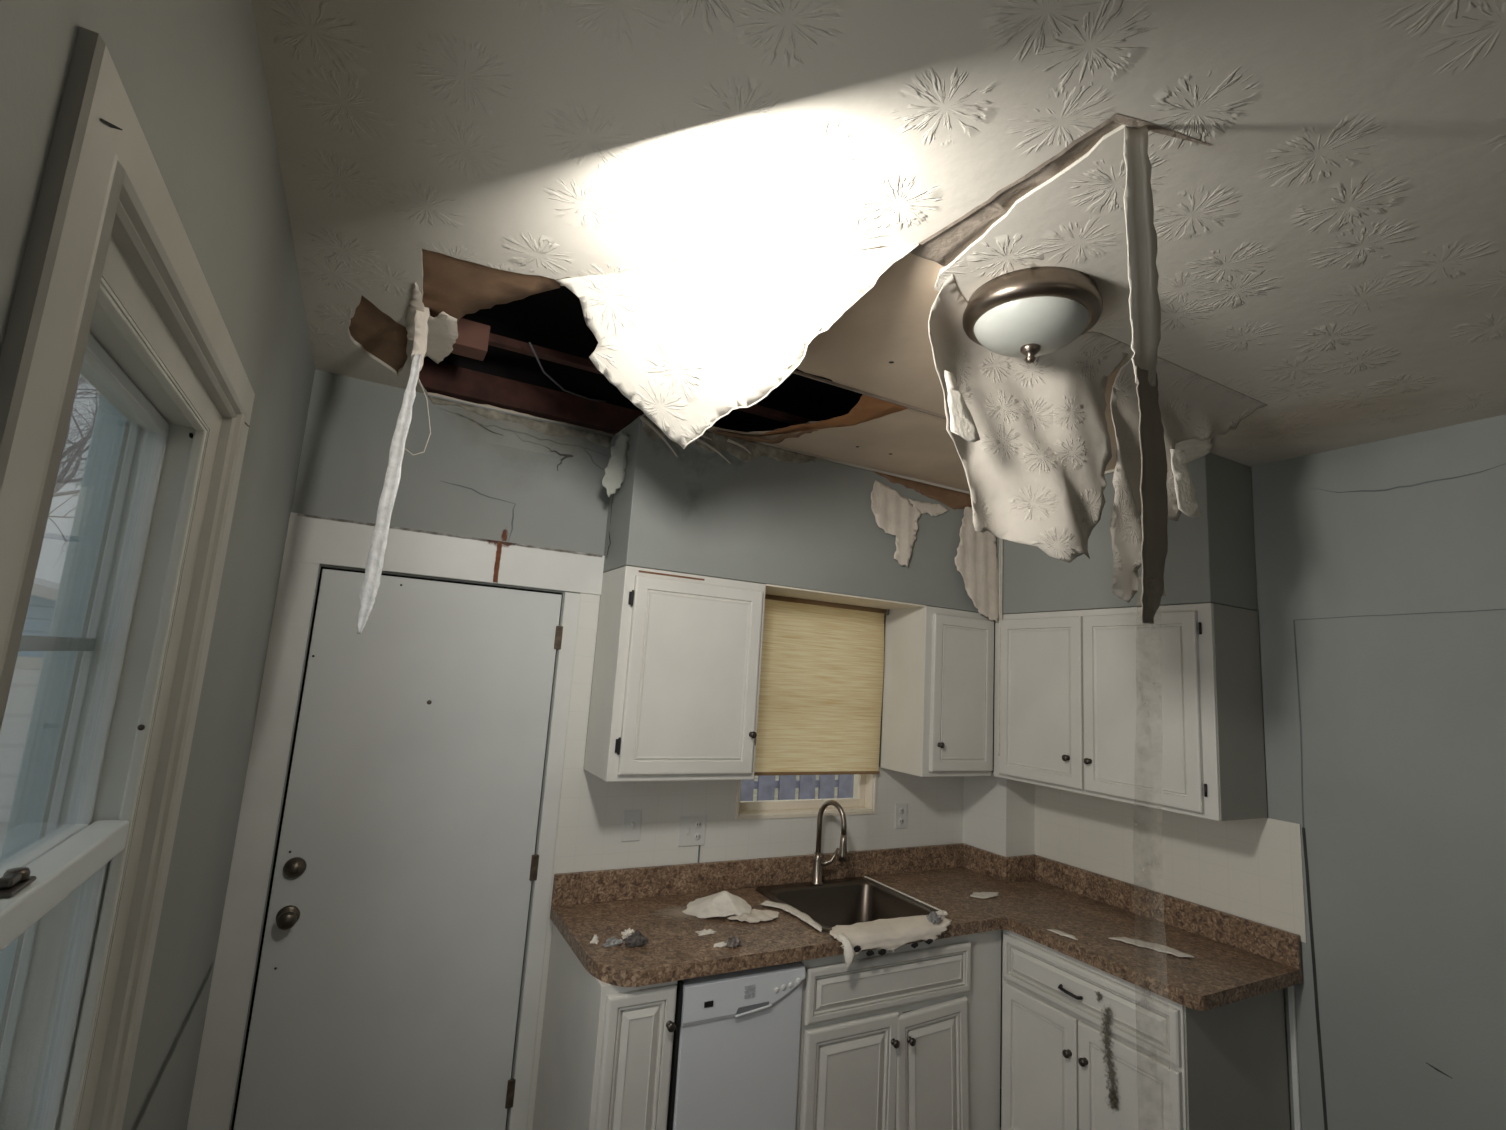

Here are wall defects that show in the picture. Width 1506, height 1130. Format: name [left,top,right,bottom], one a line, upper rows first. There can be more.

peeling [602,431,629,497]
crack [1320,464,1504,493]
rust [488,530,516,583]
peeling [871,480,999,622]